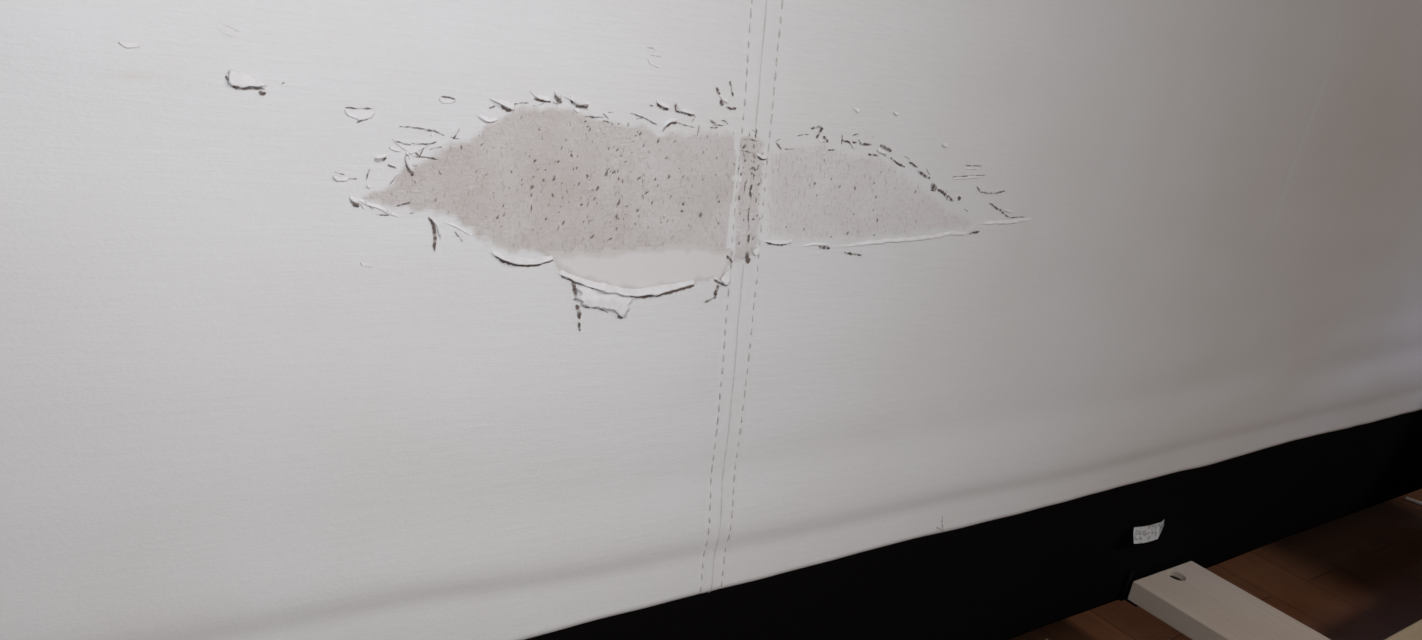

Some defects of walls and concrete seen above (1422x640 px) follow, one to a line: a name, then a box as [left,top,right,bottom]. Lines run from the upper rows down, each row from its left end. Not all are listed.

peeling [333,90,747,303]